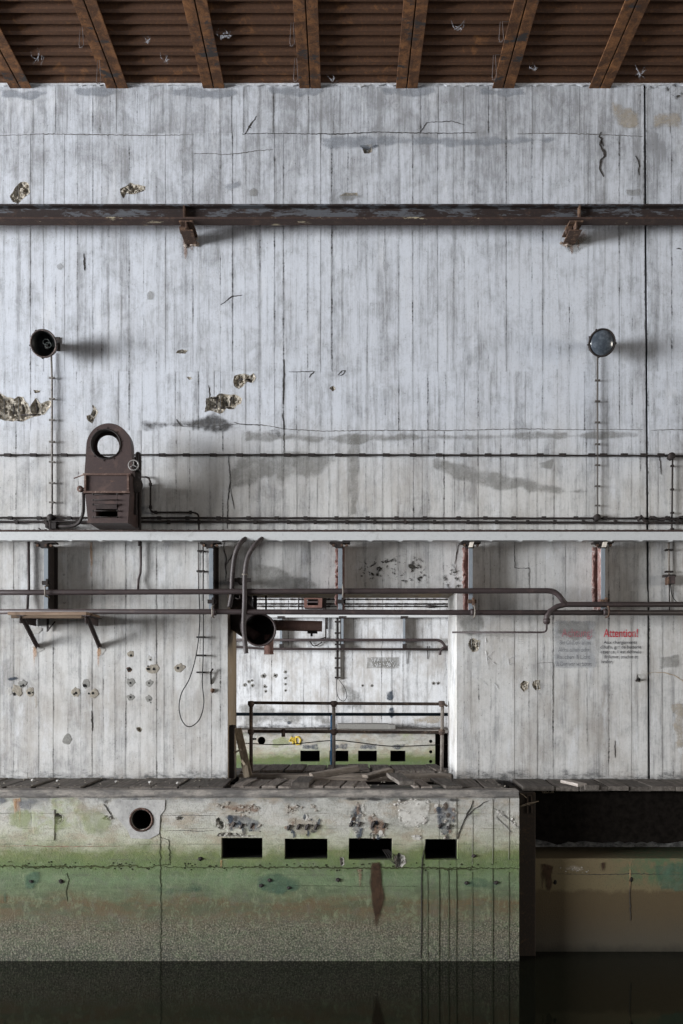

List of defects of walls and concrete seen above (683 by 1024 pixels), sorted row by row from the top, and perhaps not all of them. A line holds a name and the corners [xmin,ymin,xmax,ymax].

crack [528,132,643,177]
spalling [10,182,30,204]
spalling [120,182,145,198]
spalling [0,390,51,422]
spalling [205,373,256,414]
peeling [216,802,262,837]
peeling [284,804,321,838]
peeling [348,802,388,840]
crack [159,815,214,960]
corrosion [358,862,384,925]
crack [296,801,516,959]